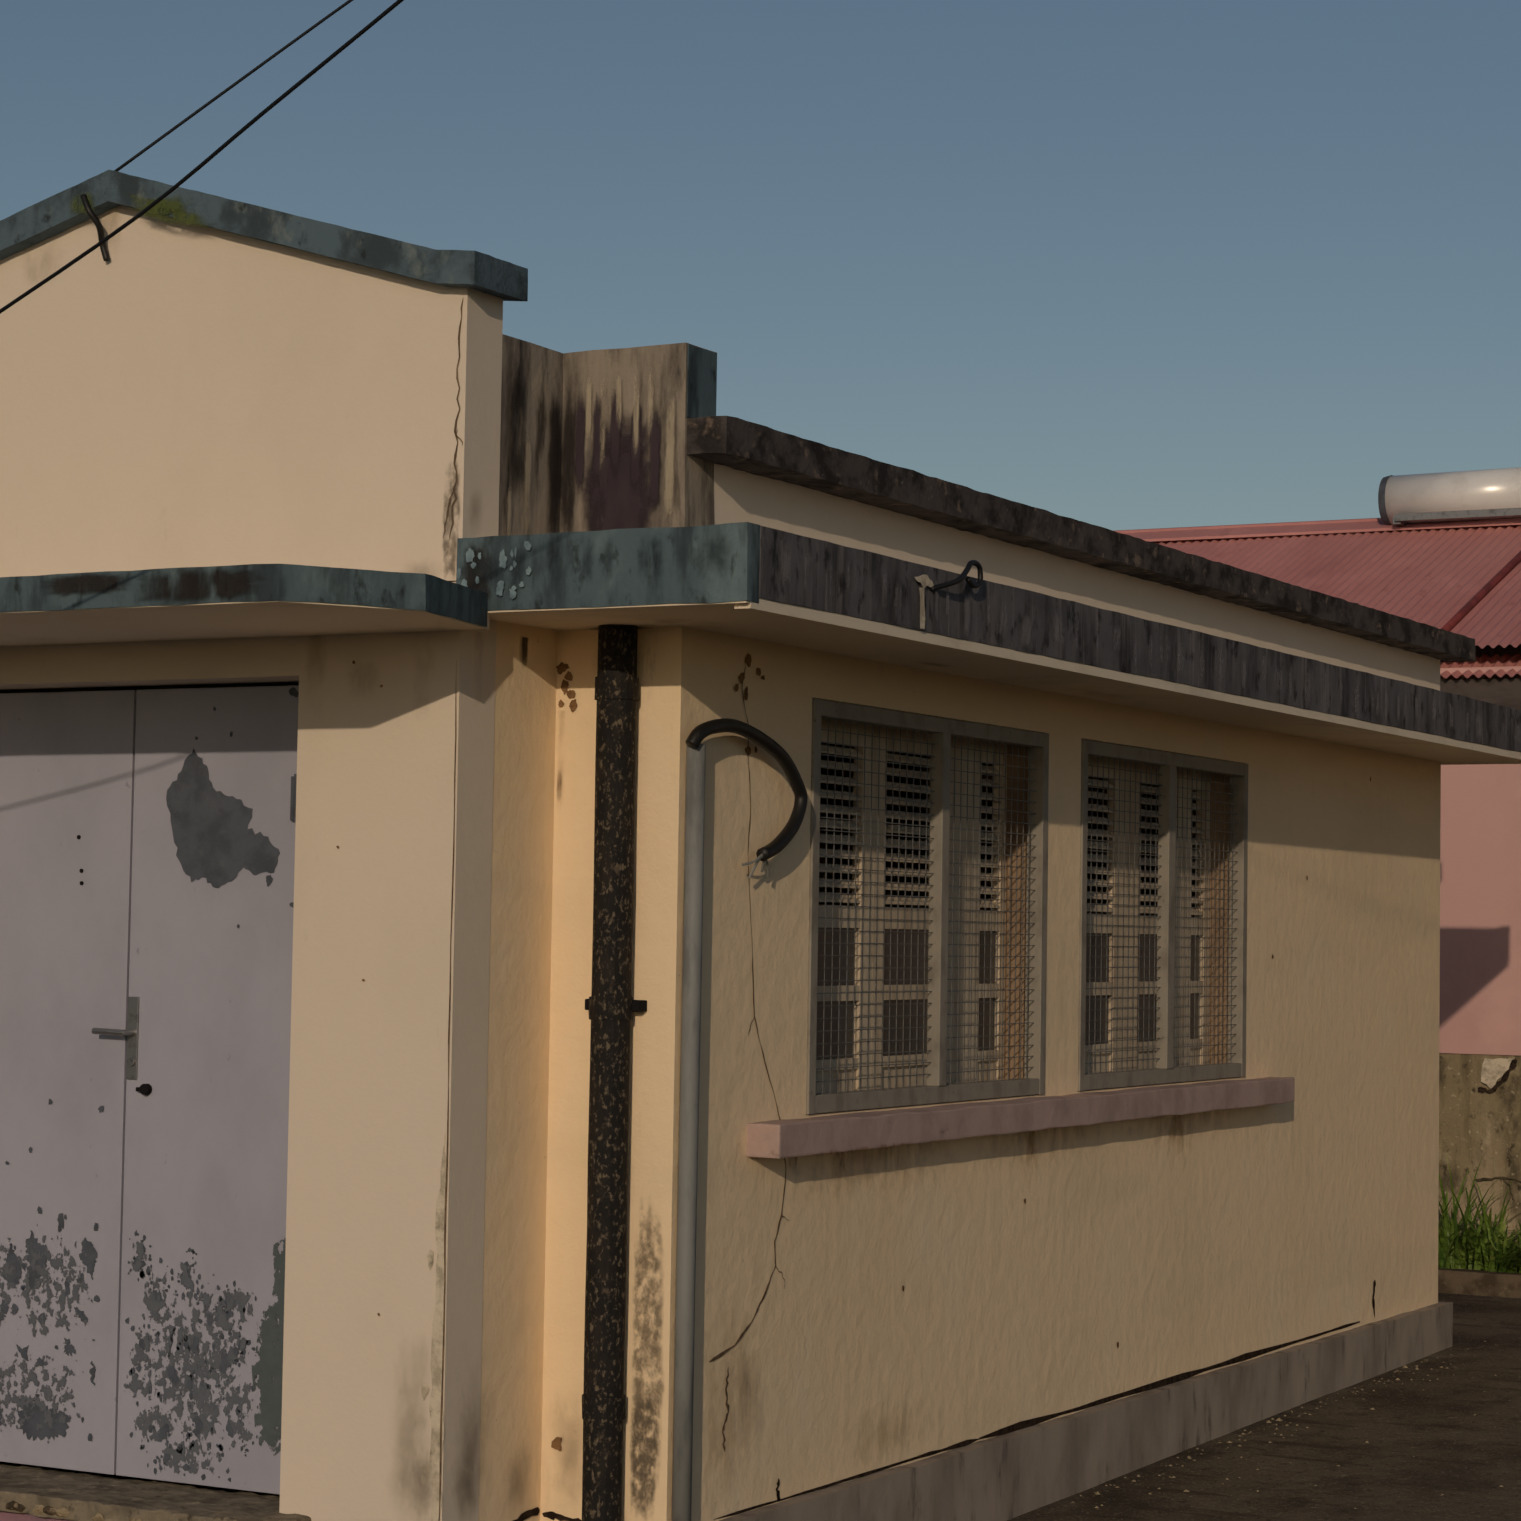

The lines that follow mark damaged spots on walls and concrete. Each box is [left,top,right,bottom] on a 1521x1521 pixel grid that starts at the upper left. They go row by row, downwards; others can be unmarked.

crack [443,300,463,538]
peeling [457,541,532,599]
water stain [507,372,675,535]
peeling [166,737,280,888]
crack [742,666,781,1120]
peeling [0,1206,100,1443]
peeling [124,1230,286,1482]
water stain [632,1228,661,1510]
crack [709,1158,786,1451]
crack [714,1280,1376,1520]